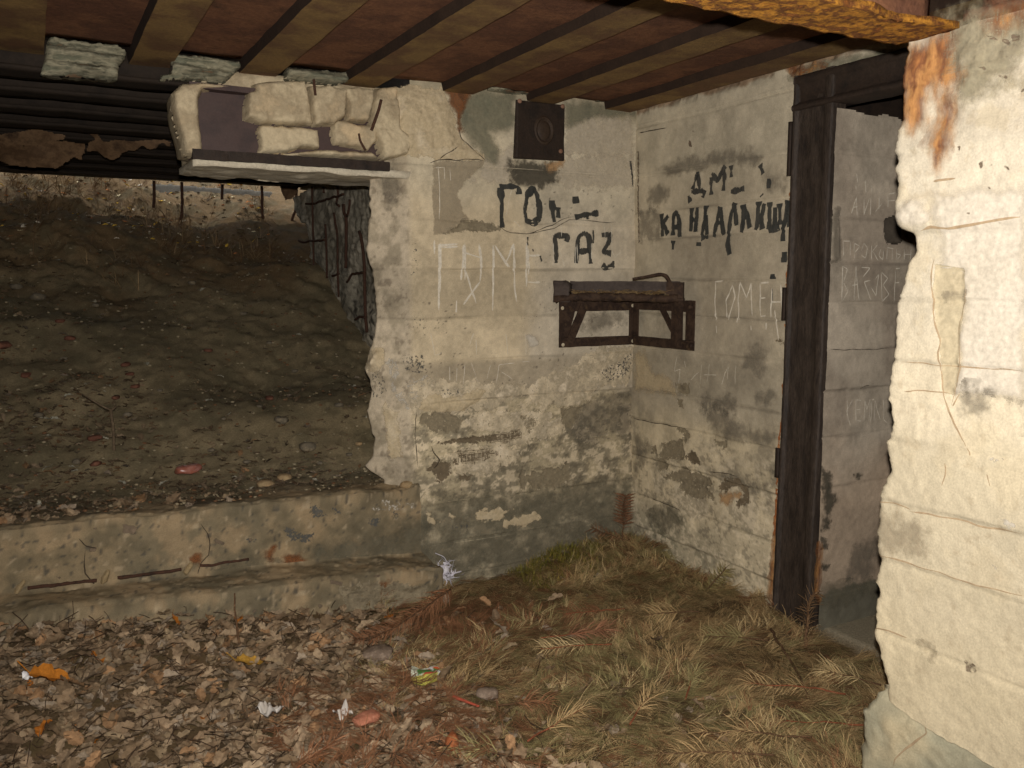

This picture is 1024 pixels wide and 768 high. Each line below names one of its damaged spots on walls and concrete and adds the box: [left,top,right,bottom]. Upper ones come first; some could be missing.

water stain [460,92,514,163]
corrosion [903,33,957,166]
peeling [403,345,634,490]
peeling [651,427,751,509]
peeling [448,506,541,532]